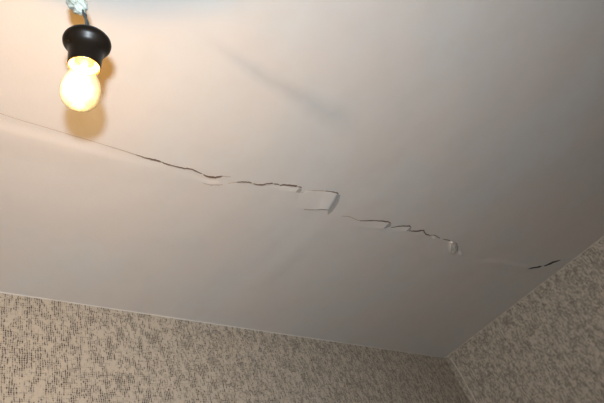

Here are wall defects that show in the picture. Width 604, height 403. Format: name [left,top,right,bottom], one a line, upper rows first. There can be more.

crack [344,216,450,241]
crack [527,259,566,271]